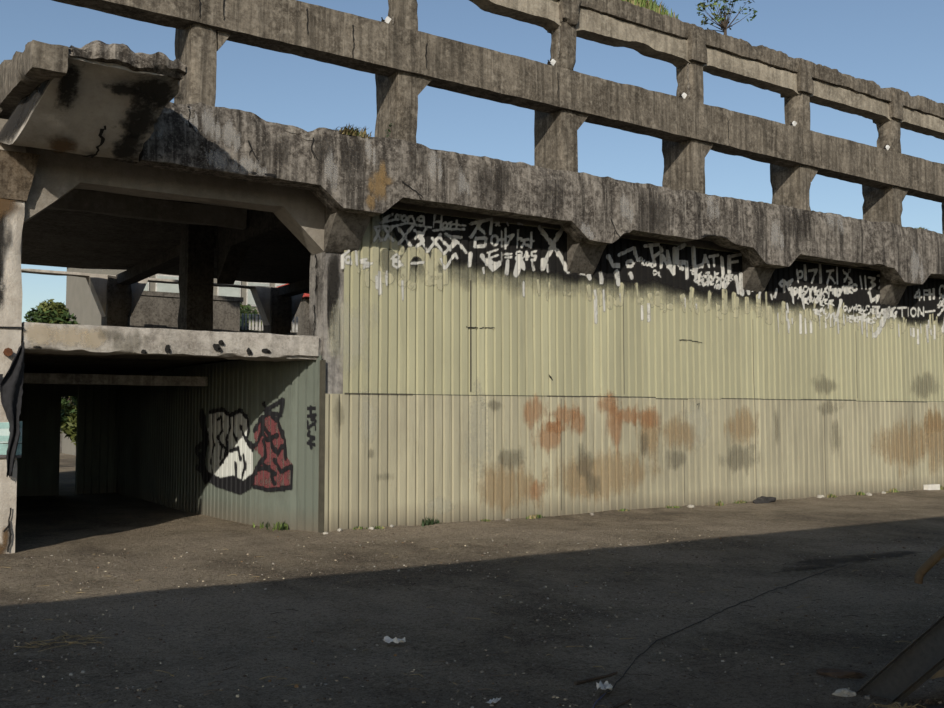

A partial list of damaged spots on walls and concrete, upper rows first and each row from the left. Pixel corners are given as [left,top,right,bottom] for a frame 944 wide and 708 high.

damp [0,65,80,143]
crack [83,126,106,158]
damp [104,74,181,163]
damp [0,198,15,300]